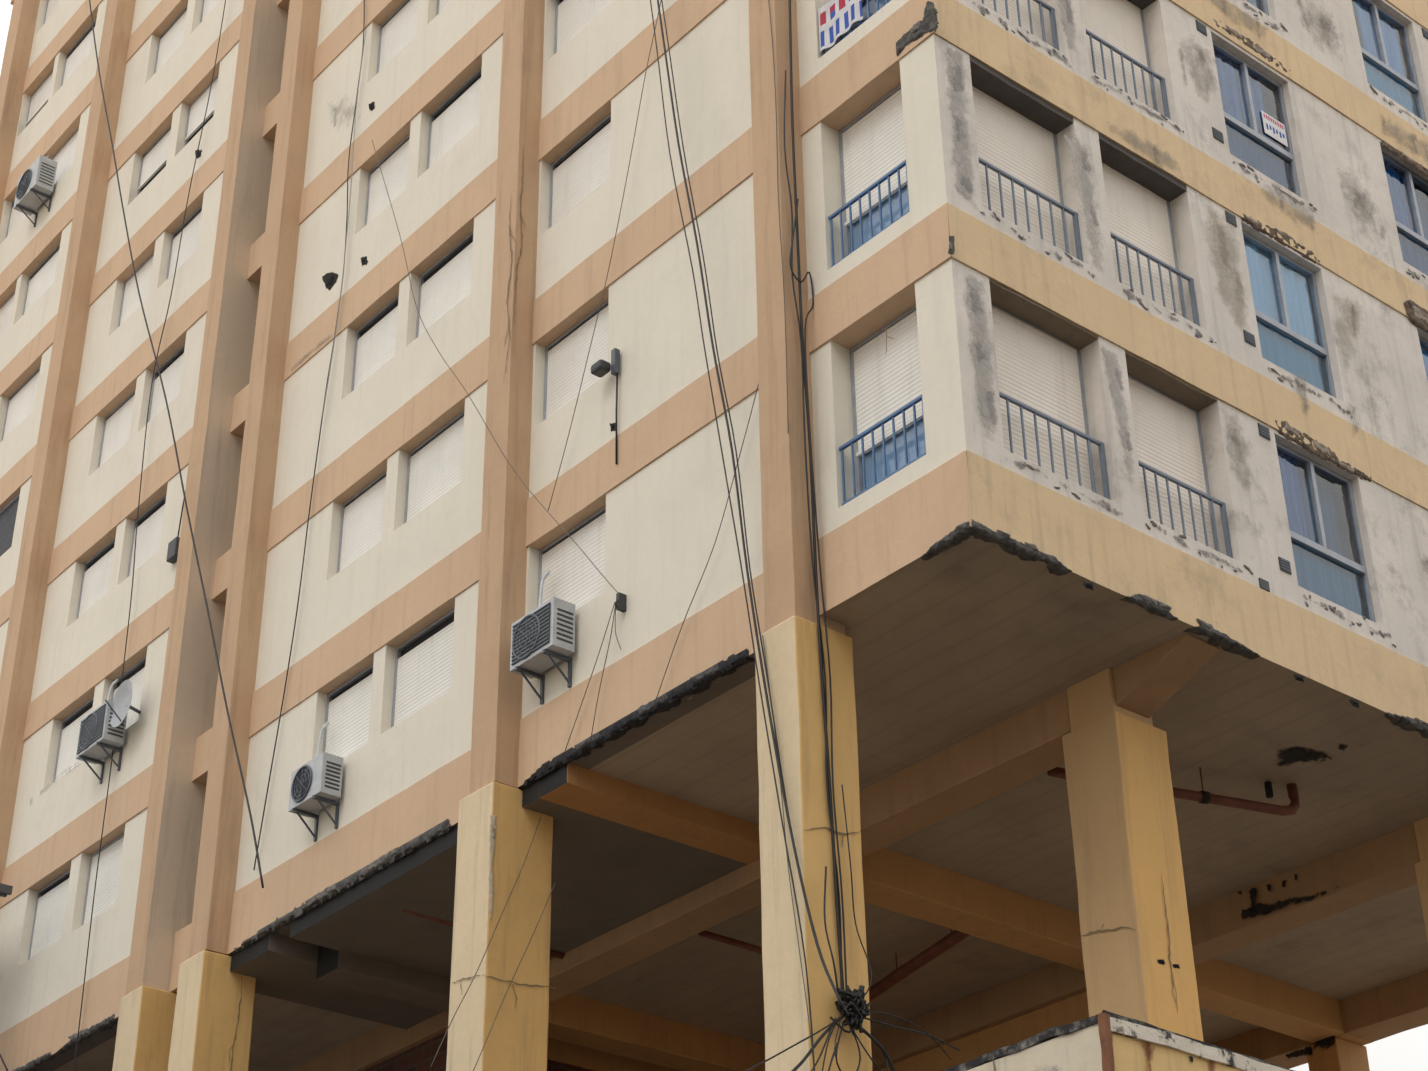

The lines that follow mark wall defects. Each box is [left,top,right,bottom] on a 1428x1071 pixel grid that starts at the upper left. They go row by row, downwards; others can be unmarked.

spalling [896,1,939,56]
peeling [947,48,973,199]
spalling [1241,213,1320,265]
spalling [1404,300,1428,332]
spalling [1275,420,1372,482]
spalling [920,519,1094,590]
spalling [1120,594,1260,660]
spalling [1383,712,1428,739]
crack [1081,874,1178,1013]